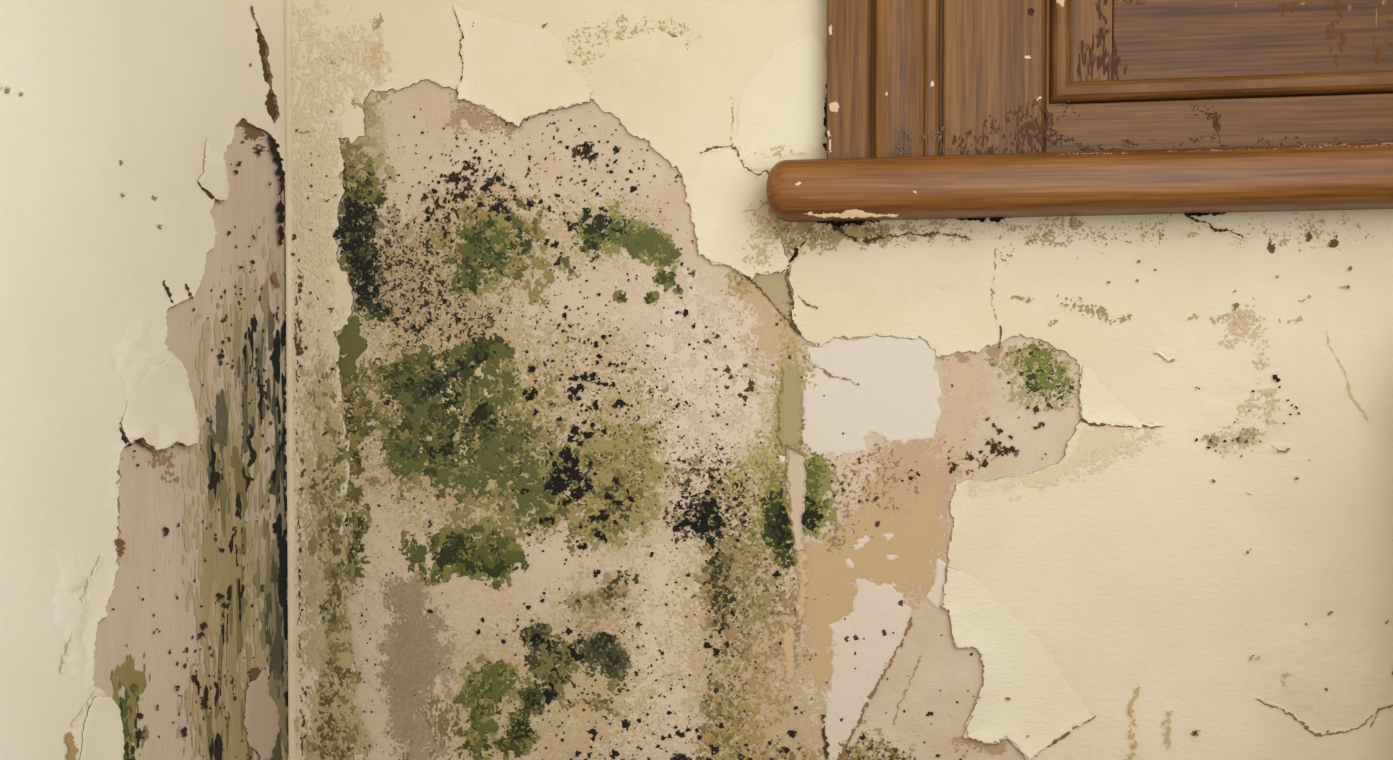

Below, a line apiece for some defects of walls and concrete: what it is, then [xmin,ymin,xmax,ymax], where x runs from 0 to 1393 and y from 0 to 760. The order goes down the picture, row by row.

crack [251,6,316,246]
crack [821,55,829,151]
water stain [772,212,1389,265]
water stain [1188,295,1311,324]
spalling [79,119,285,760]
water stain [110,0,1164,760]
spalling [334,5,1142,760]
mould [1195,375,1300,457]
crack [1326,331,1368,420]